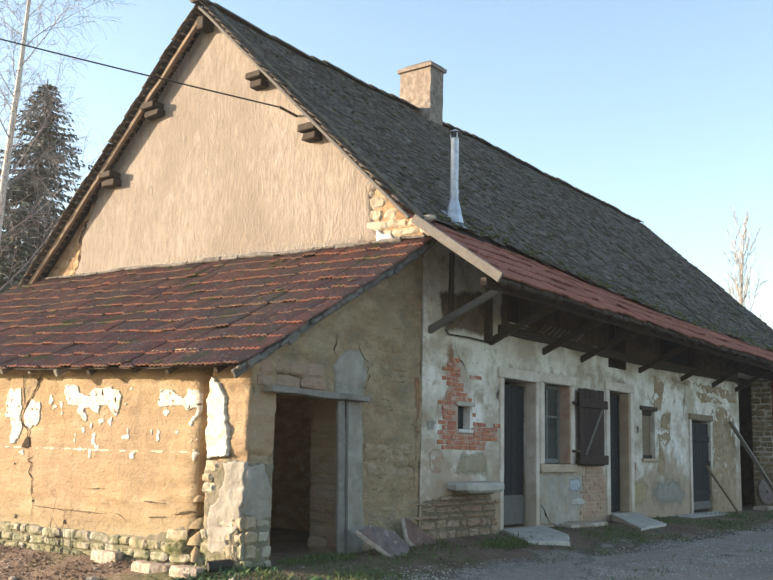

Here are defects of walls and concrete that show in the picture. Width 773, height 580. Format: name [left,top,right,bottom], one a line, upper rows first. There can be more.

crack [21,373,42,511]
peeling [5,384,133,459]
peeling [151,377,231,468]
spalling [429,358,501,473]
spalling [651,376,737,513]
spalling [187,517,204,563]